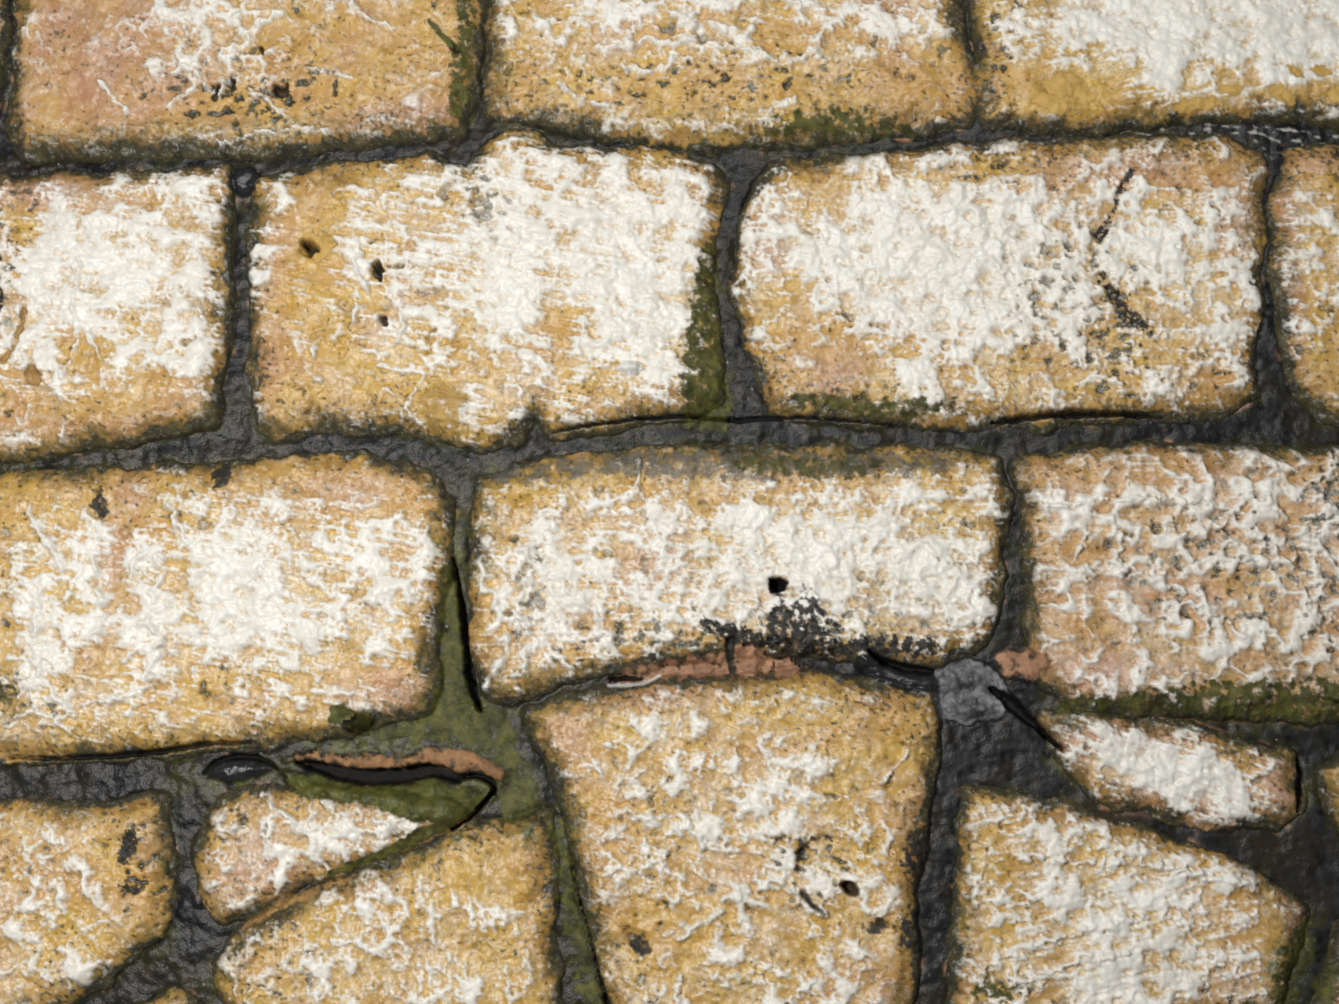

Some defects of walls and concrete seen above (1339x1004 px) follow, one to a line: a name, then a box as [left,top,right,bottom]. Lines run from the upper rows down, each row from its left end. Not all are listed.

crack [552,414,890,434]
crack [993,411,1162,425]
spalling [607,636,807,688]
damp [328,703,356,725]
crack [12,742,504,830]
damp [327,788,496,878]
damp [970,981,1022,1003]